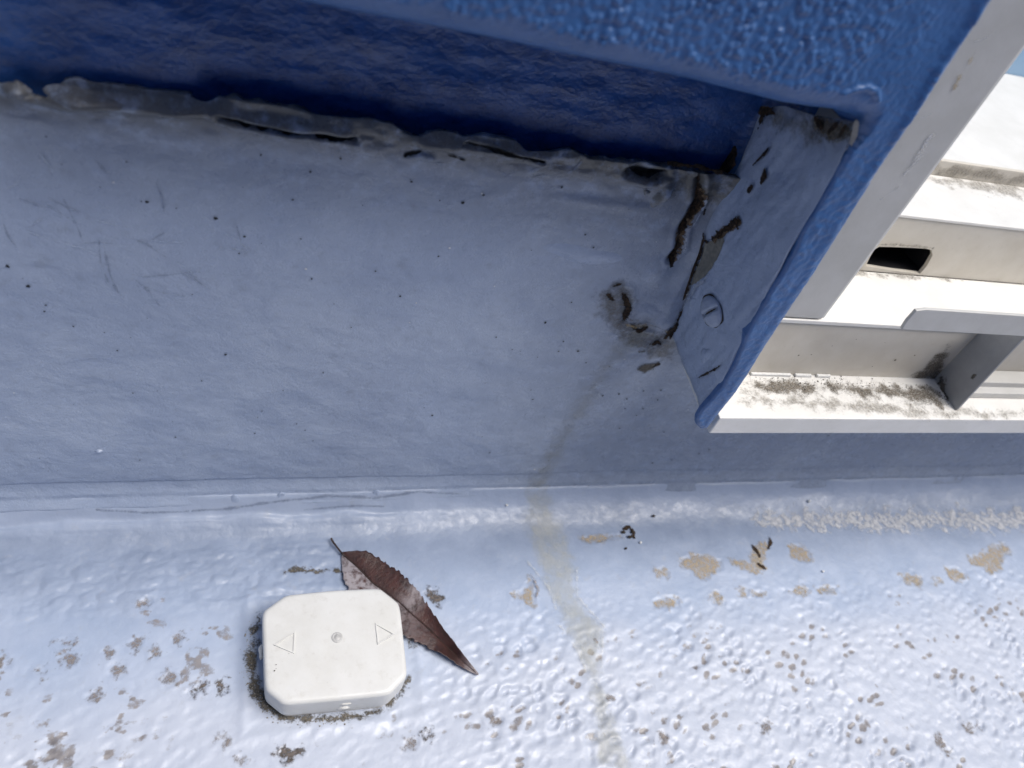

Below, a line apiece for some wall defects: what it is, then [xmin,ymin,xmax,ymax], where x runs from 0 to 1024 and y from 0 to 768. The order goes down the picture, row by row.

peeling [970,546,1009,574]
spalling [272,744,305,766]